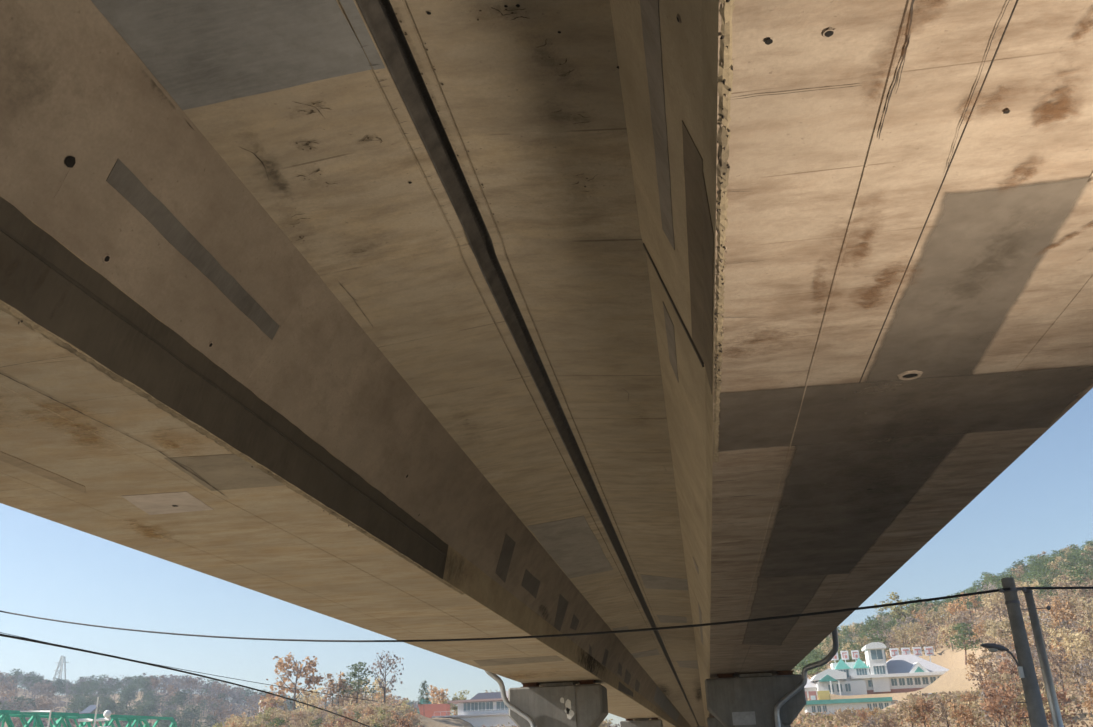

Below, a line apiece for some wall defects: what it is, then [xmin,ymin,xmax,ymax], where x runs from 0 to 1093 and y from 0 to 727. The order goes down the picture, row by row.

spalling [713,0,735,462]